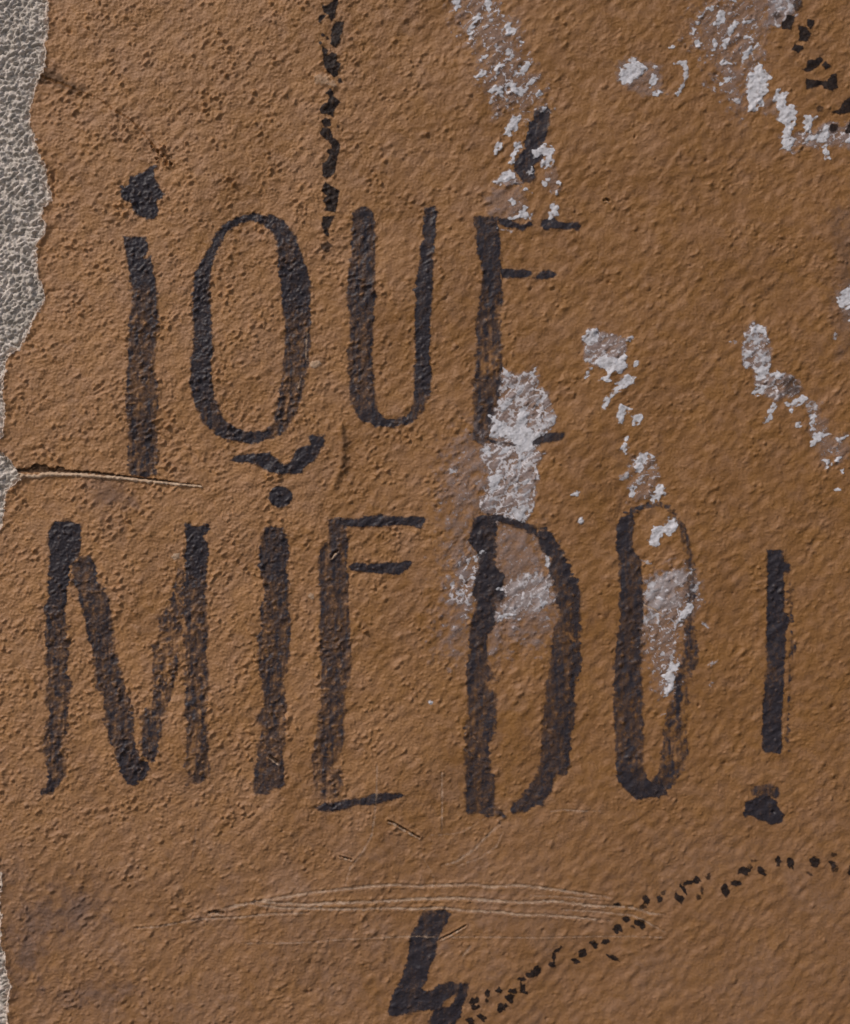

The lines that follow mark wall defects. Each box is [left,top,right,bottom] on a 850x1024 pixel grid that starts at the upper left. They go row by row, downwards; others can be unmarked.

peeling [474,22,547,115]
peeling [619,57,662,96]
peeling [690,0,831,160]
peeling [0,0,53,439]
peeling [493,115,561,220]
peeling [0,452,22,530]
crack [17,463,202,487]
peeling [482,367,555,523]
peeling [582,328,666,504]
peeling [649,518,679,547]
peeling [742,323,849,474]
peeling [650,647,680,697]